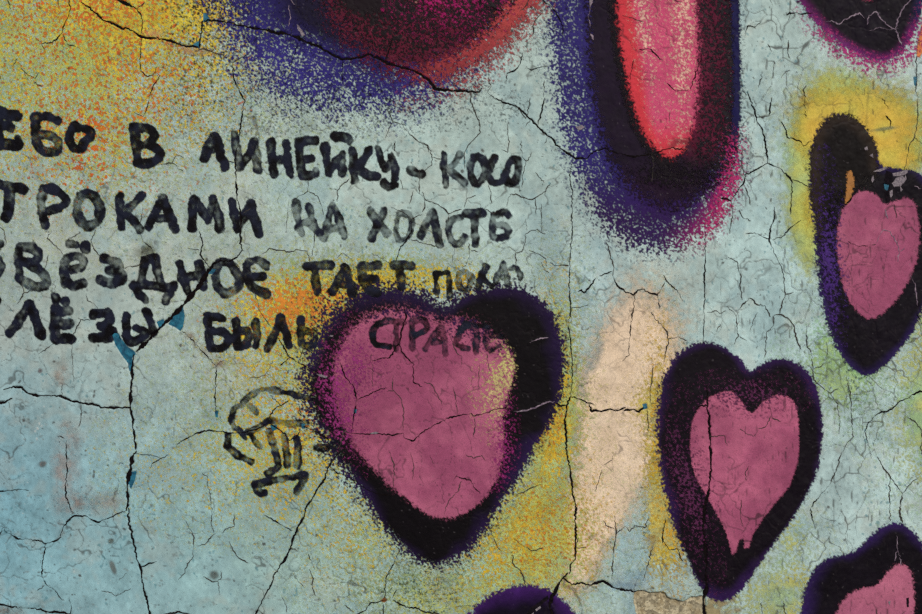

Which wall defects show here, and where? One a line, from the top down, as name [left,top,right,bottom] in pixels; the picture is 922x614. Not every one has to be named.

peeling [112,333,136,371]
peeling [157,308,185,331]
crack [0,0,687,614]
crack [697,386,781,614]